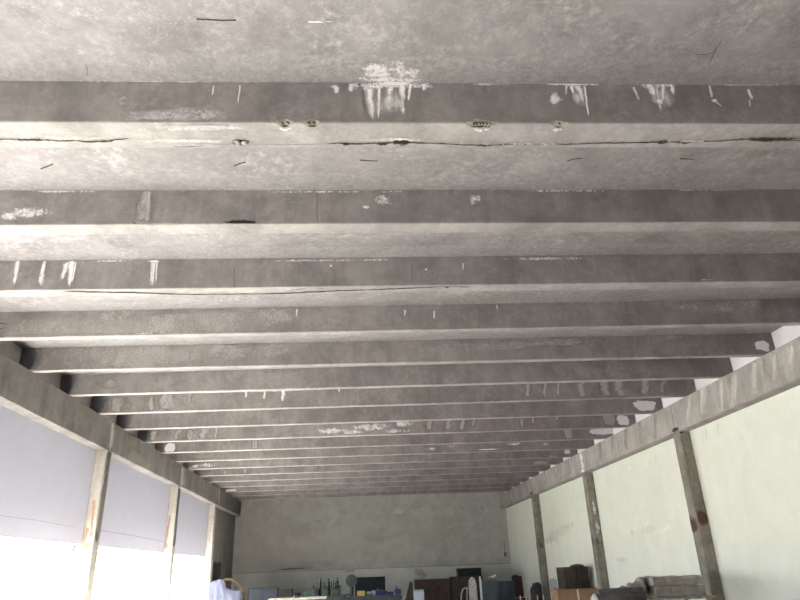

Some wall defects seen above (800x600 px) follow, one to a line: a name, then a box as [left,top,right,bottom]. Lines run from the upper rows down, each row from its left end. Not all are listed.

water stain [349,61,433,117]
water stain [548,84,598,114]
water stain [633,84,674,109]
spalling [276,118,320,131]
spalling [466,118,497,132]
crack [0,136,128,144]
crack [328,137,800,147]
water stain [61,261,76,284]
water stain [148,260,159,283]
corrosion [689,510,708,533]